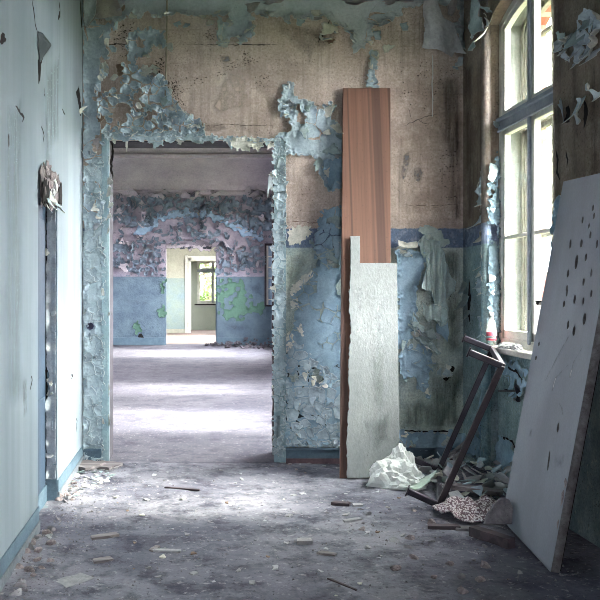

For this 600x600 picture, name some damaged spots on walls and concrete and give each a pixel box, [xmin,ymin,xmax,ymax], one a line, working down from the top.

peeling [551,8,600,69]
peeling [558,83,600,127]
peeling [76,0,502,461]
peeling [39,160,65,480]
peeling [495,353,529,398]